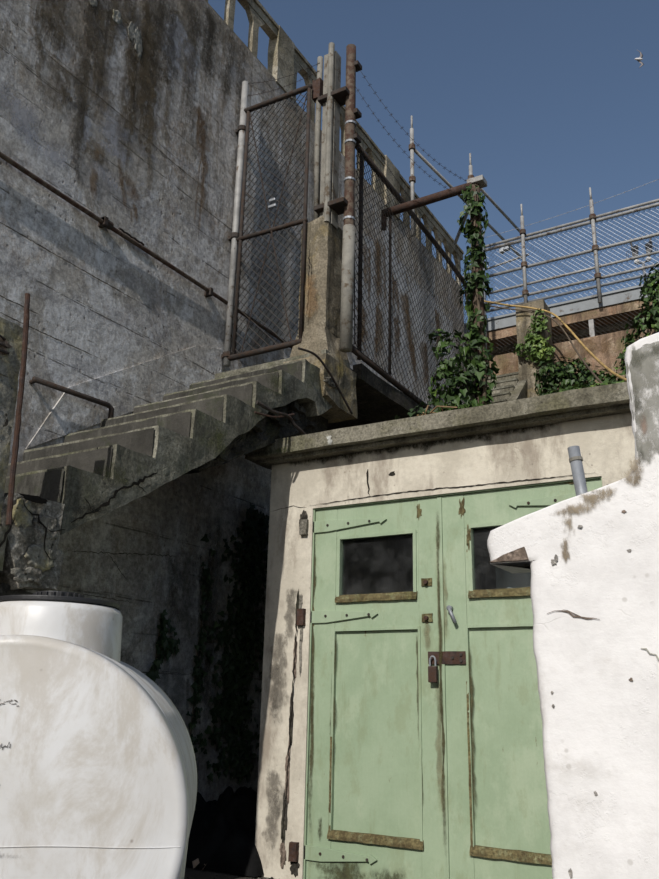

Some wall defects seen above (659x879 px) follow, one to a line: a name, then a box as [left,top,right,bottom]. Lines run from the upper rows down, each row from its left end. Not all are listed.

rust [195,107,209,227]
rust [364,241,440,383]
peeling [11,493,58,585]
crack [0,470,171,577]
spalling [192,400,316,471]
peeling [551,540,570,565]
peeling [558,480,613,528]
peeling [626,458,641,485]
crack [547,610,600,620]
water stain [270,590,295,717]
water stain [266,773,283,846]
water stain [317,862,365,879]